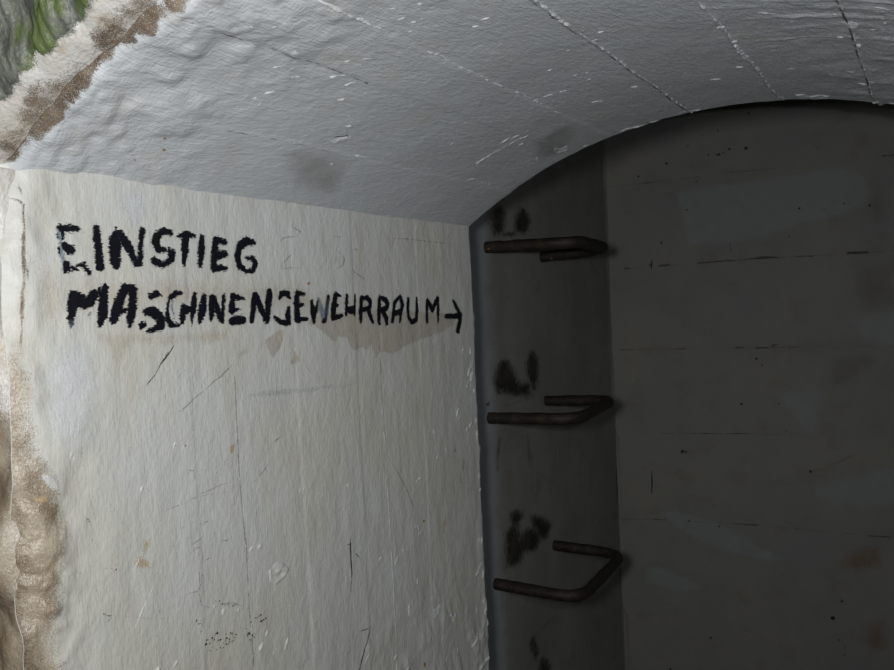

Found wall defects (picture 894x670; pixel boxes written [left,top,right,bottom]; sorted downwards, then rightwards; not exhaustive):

damp [0,0,189,162]